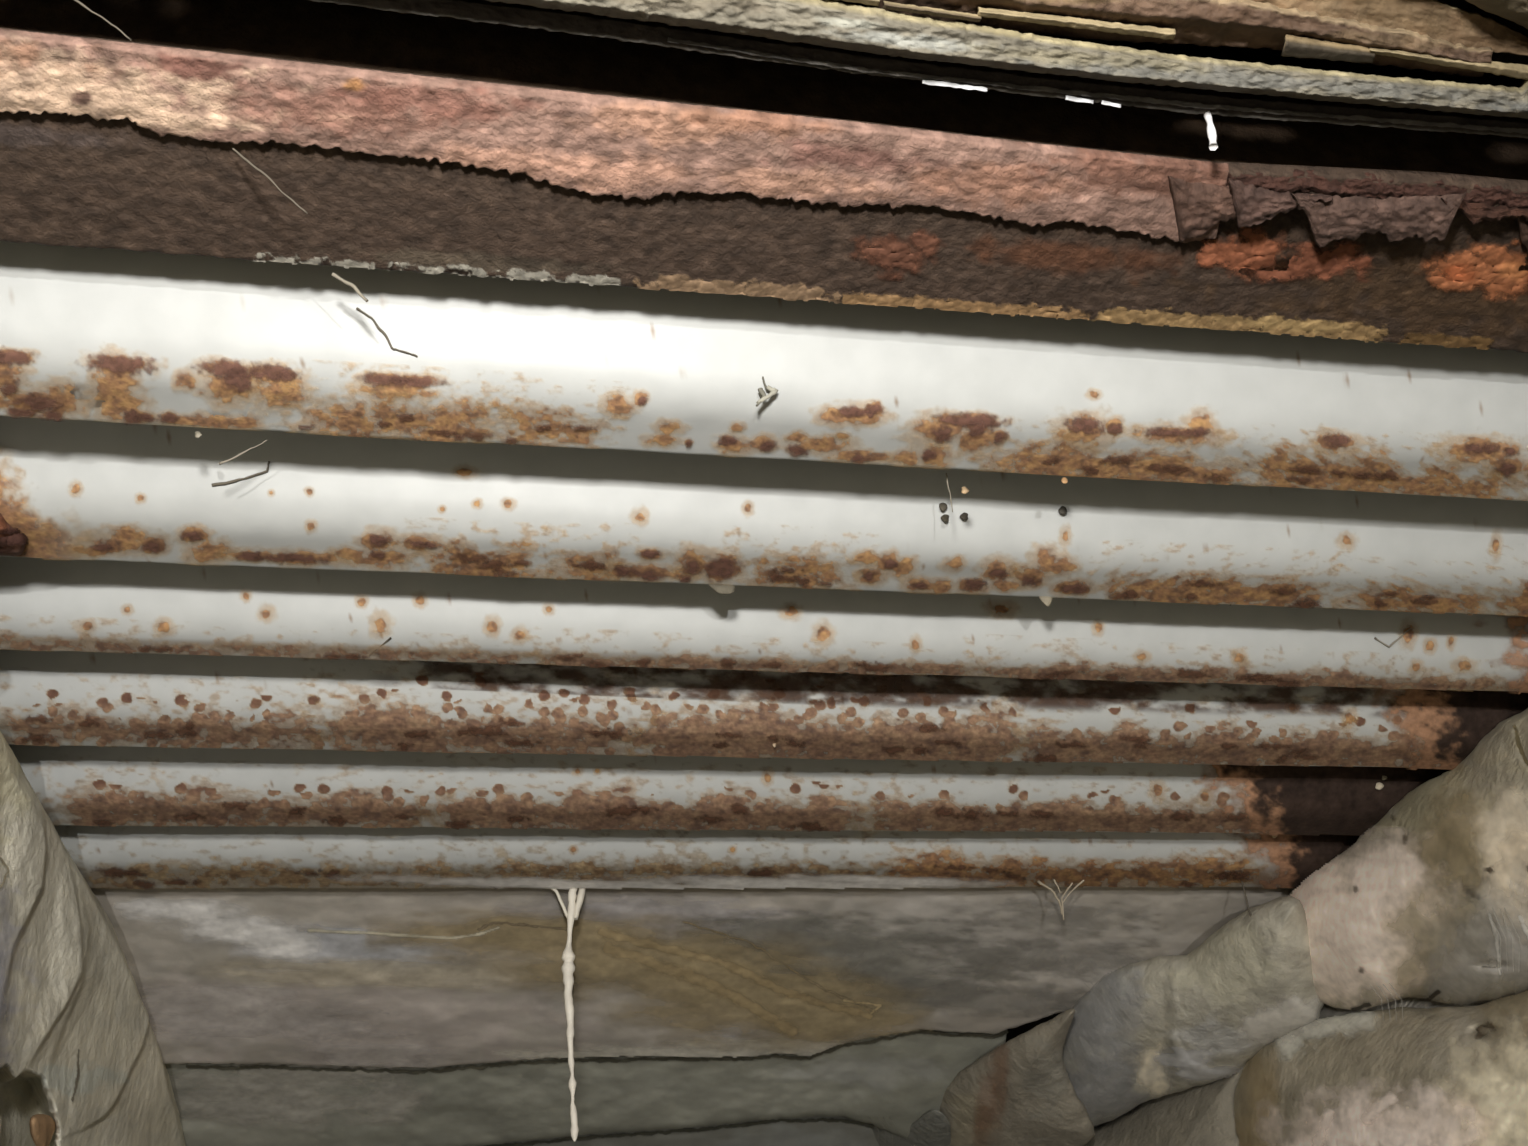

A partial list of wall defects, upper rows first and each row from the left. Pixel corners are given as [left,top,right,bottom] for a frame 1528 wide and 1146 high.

corrosion [0,28,1528,300]
corrosion [254,229,1495,350]
corrosion [0,349,648,447]
corrosion [645,420,692,447]
corrosion [717,391,1528,501]
corrosion [0,472,1326,614]
corrosion [0,581,1528,890]
crack [186,921,1009,1074]